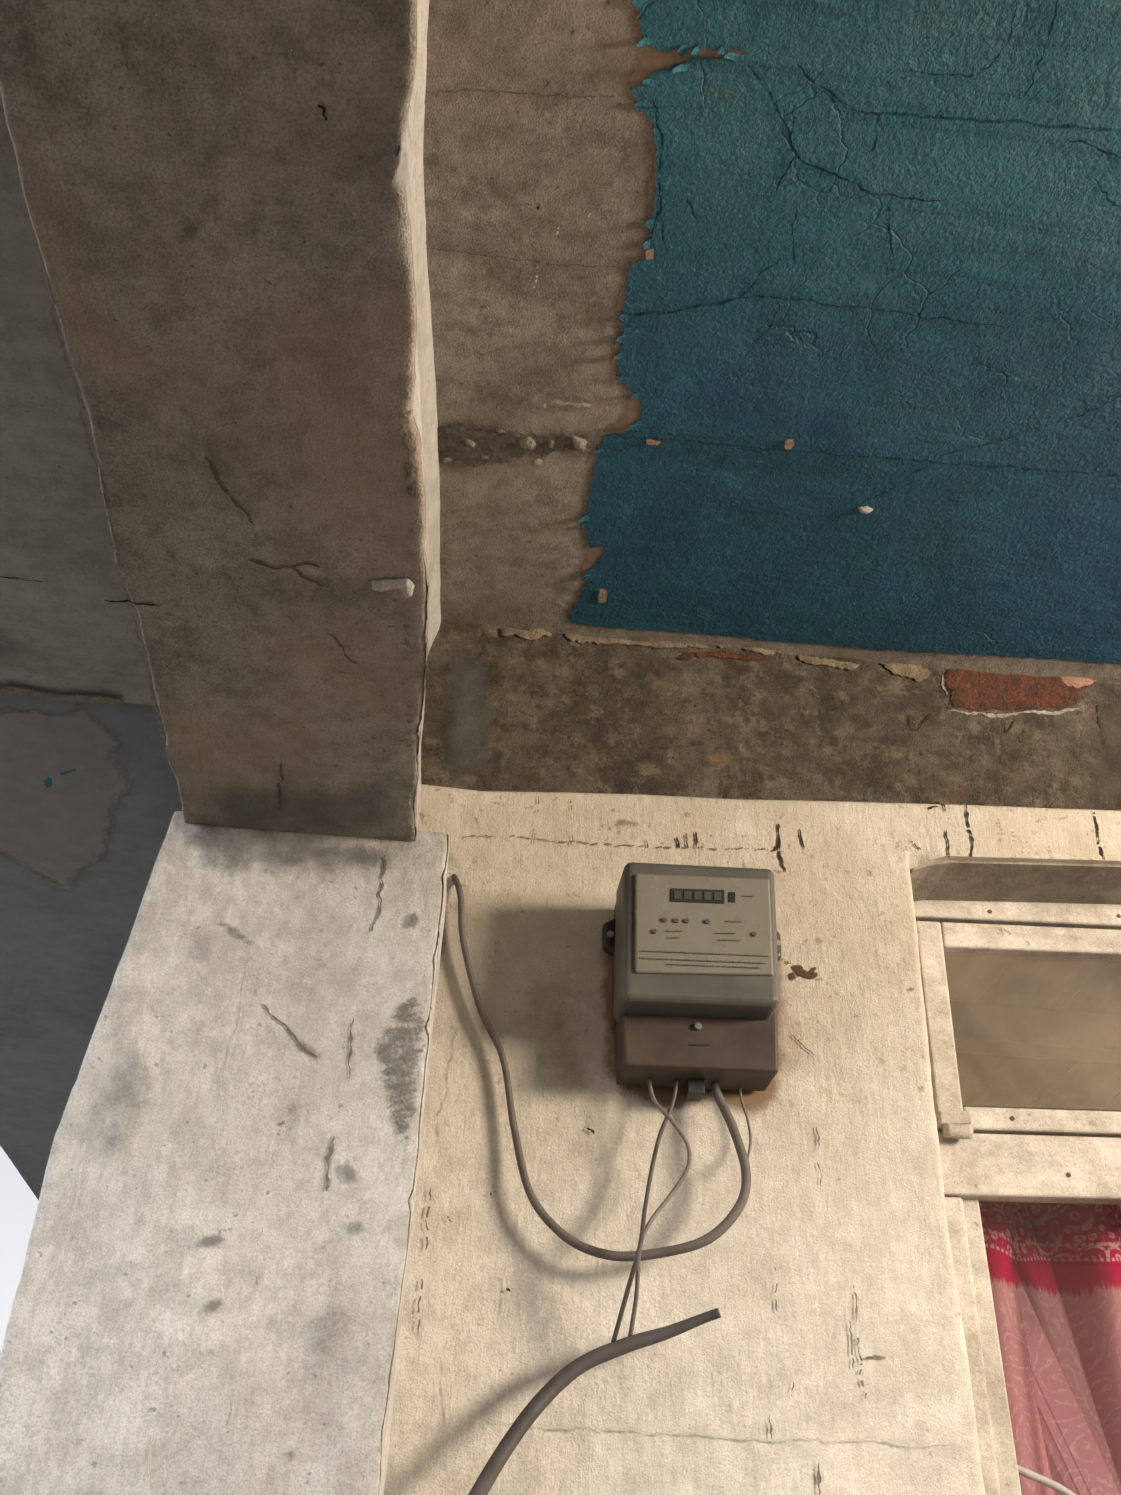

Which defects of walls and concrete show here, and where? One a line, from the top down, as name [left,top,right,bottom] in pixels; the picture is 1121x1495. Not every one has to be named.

crack [410,0,1121,378]
peeling [566,0,750,618]
crack [606,395,1121,528]
crack [204,457,324,587]
crack [105,598,159,606]
spalling [371,579,415,598]
flaking render [945,669,1087,712]
crack [371,856,387,931]
crack [262,1004,354,1078]
crack [412,1188,452,1331]
crack [849,1285,886,1399]
crack [815,1463,823,1495]